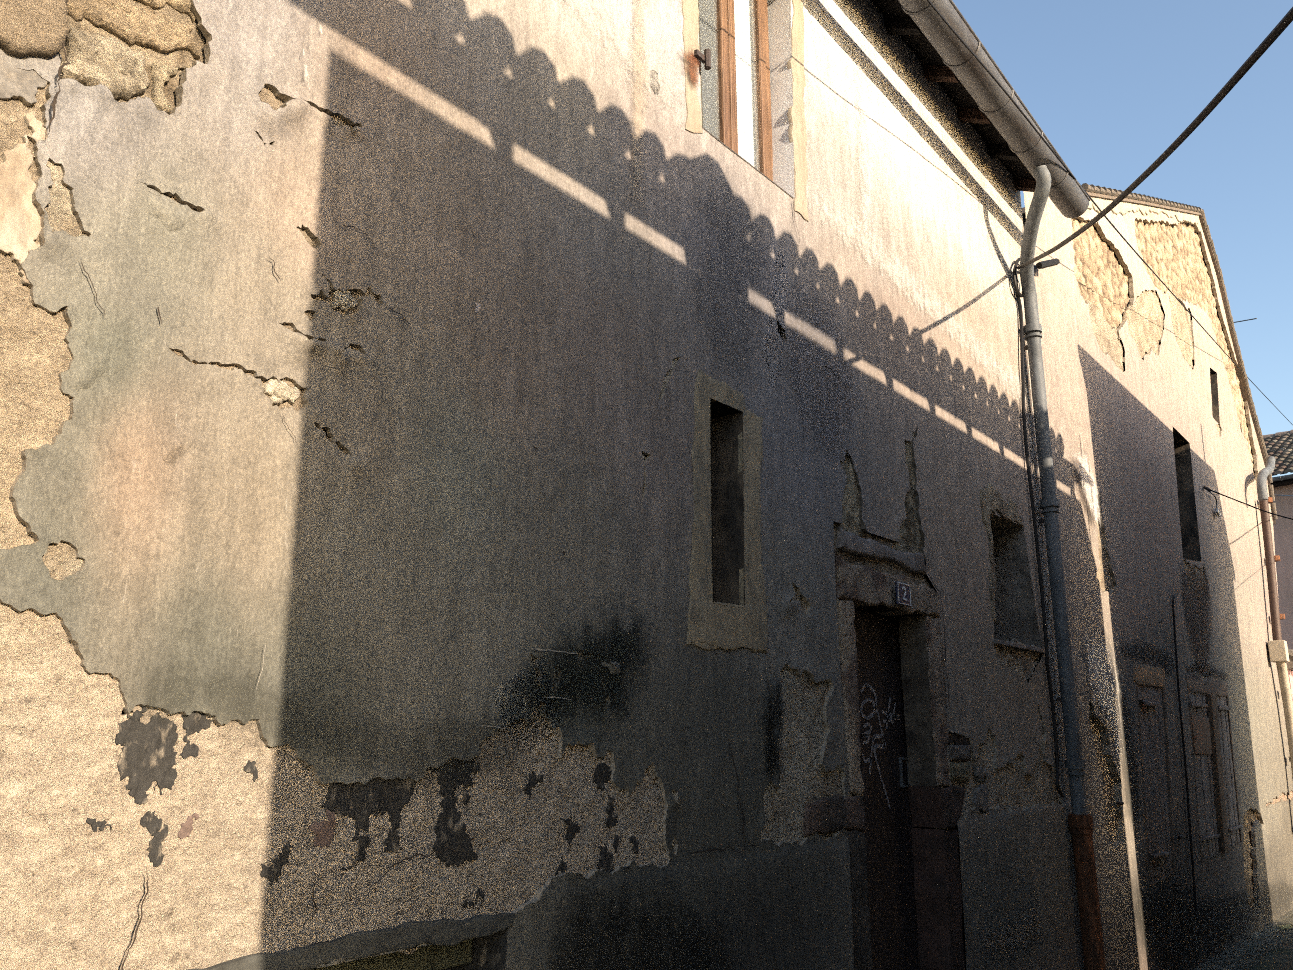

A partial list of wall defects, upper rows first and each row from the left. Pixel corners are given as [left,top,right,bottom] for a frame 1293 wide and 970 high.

crack [44,0,70,136]
flaking render [258,83,362,132]
flaking render [0,0,212,580]
spalling [169,348,308,411]
spalling [296,225,321,249]
spalling [279,274,384,342]
flaking render [1071,216,1258,483]
water stain [517,617,644,718]
flaking render [0,599,679,970]
flaking render [760,663,846,847]
flaking render [1089,702,1125,848]
flaking render [1243,789,1293,909]